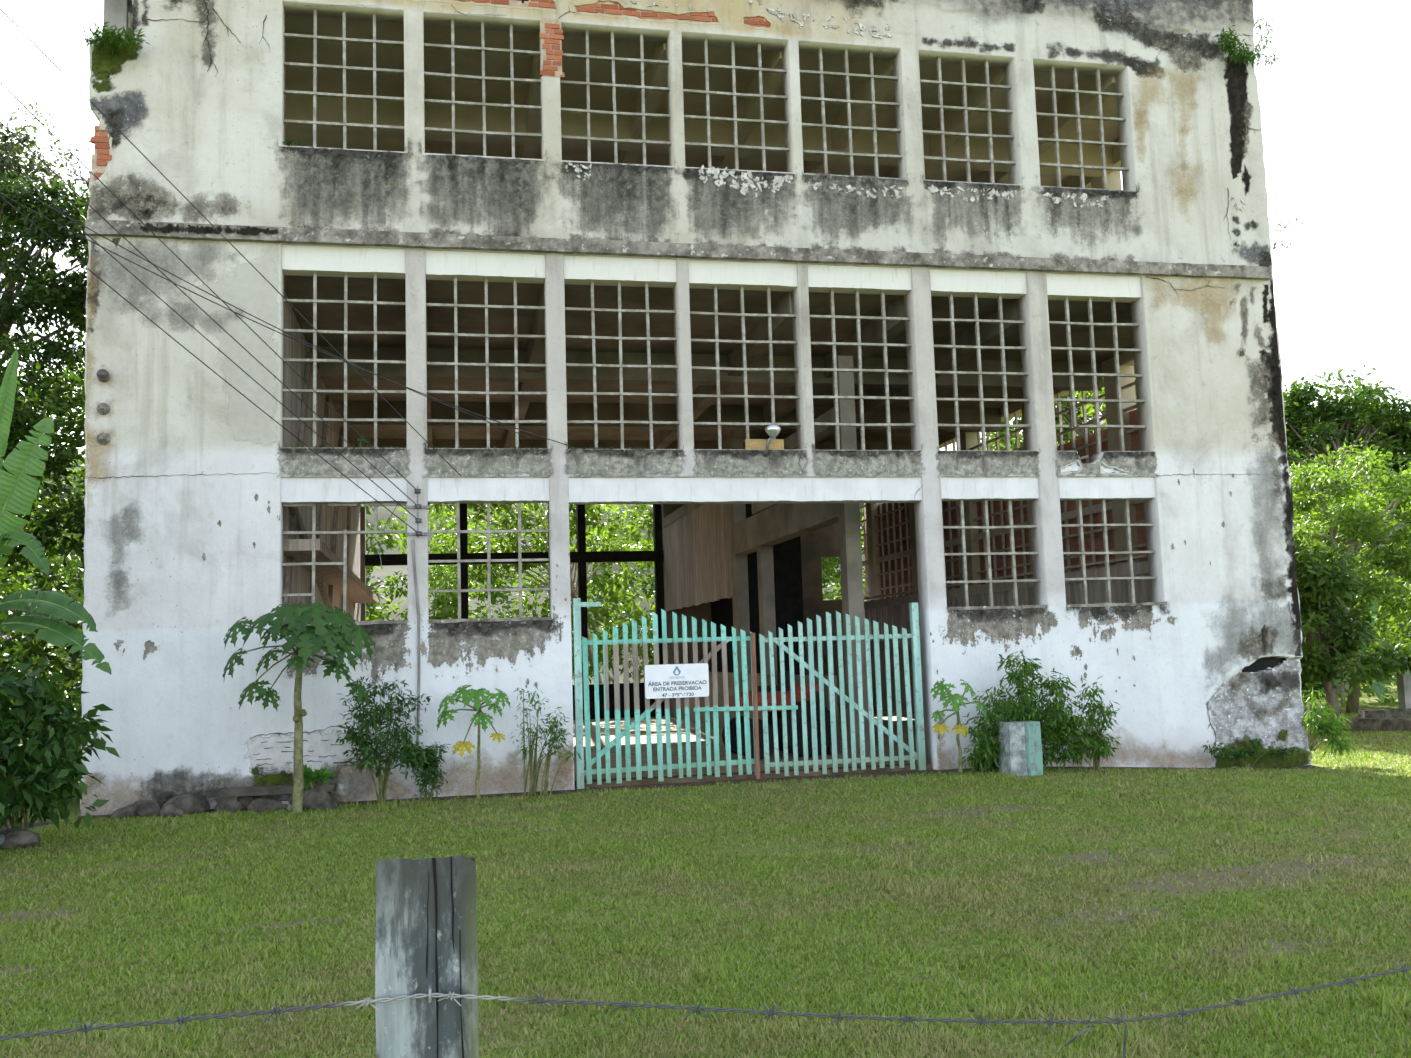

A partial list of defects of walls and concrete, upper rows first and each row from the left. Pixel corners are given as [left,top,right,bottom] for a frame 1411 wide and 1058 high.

damp [128,0,148,38]
damp [201,0,216,66]
flaking render [407,0,722,79]
peeling [741,0,892,39]
damp [923,37,1015,52]
damp [1047,0,1253,195]
flaking render [87,126,112,184]
damp [88,174,278,236]
damp [279,143,1141,259]
damp [1232,216,1302,659]
peeling [280,552,570,682]
spalling [1205,656,1312,768]